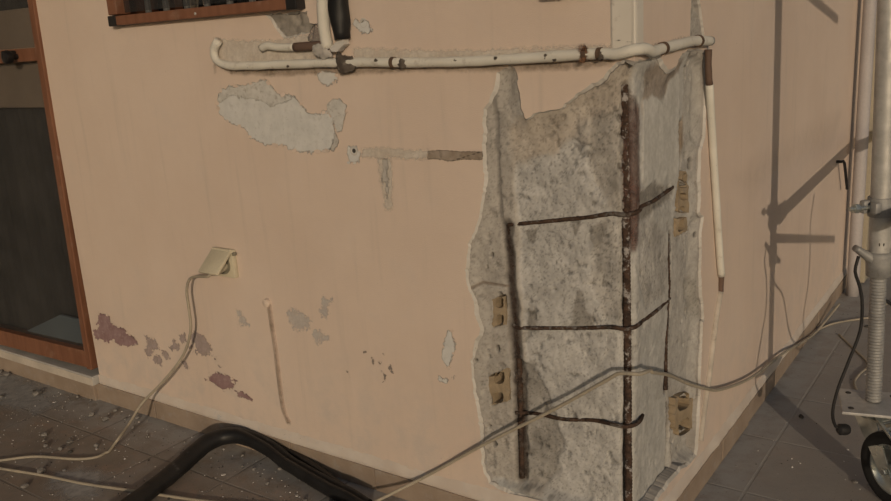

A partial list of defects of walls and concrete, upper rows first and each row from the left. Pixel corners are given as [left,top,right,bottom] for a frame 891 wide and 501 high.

crack [691,0,704,36]
peeling [215,78,348,155]
peeling [317,71,339,86]
corrosion [622,98,640,250]
spalling [465,47,709,501]
peeling [92,313,253,401]
corrosion [506,226,527,475]